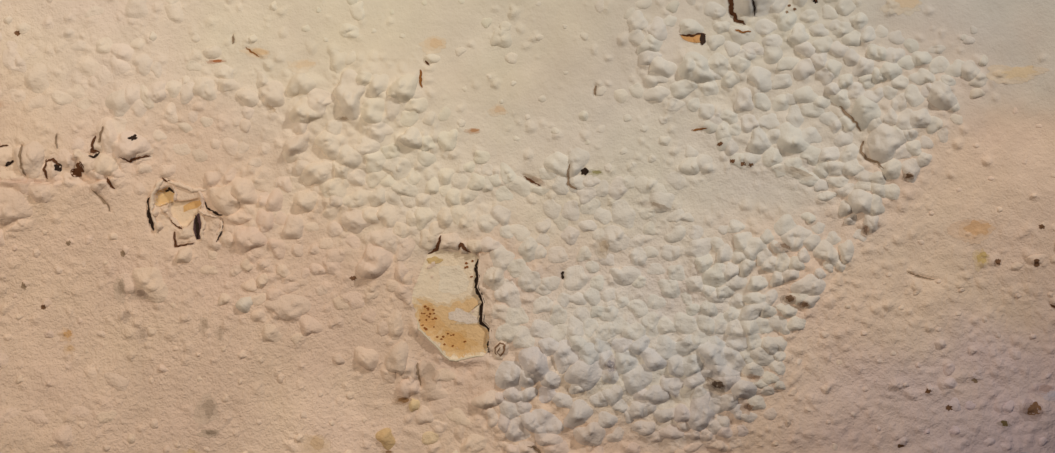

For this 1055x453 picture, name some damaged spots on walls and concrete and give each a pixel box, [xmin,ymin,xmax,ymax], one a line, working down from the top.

peeling [177,213,201,240]
flaking render [412,250,510,362]